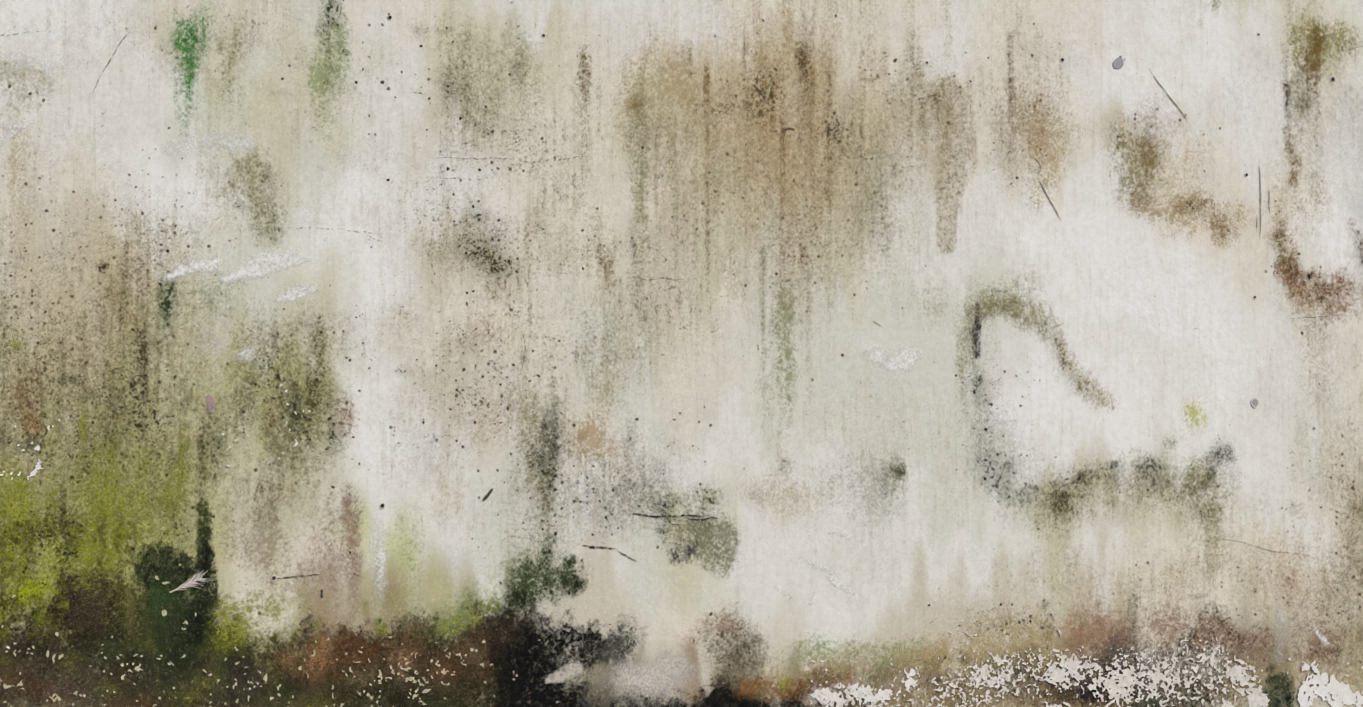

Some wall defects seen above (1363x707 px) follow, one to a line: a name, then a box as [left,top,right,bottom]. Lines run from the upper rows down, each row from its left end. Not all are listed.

leakage [174,14,241,107]
leakage [228,155,282,248]
leakage [401,27,526,137]
leakage [627,12,917,401]
leakage [859,37,972,250]
leakage [1113,108,1164,216]
leakage [1284,17,1357,184]
leakage [0,196,229,669]
leakage [413,152,738,587]
leakage [955,283,1184,530]
leakage [440,597,808,707]
leakage [998,623,1263,707]